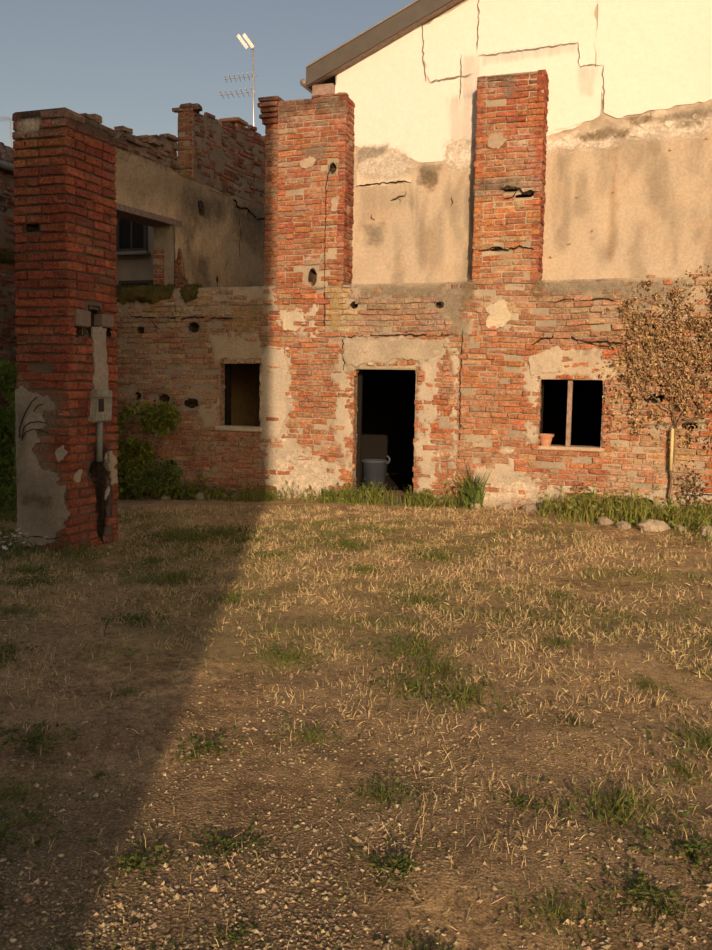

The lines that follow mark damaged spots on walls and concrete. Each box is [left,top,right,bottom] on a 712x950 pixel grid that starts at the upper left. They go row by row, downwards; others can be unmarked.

water stain [546,112,709,154]
water stain [357,138,476,188]
crack [233,199,265,251]
crack [322,166,463,470]
peeling [486,299,512,329]
peeling [212,335,292,441]
peeling [529,350,574,375]
peeling [15,385,70,547]